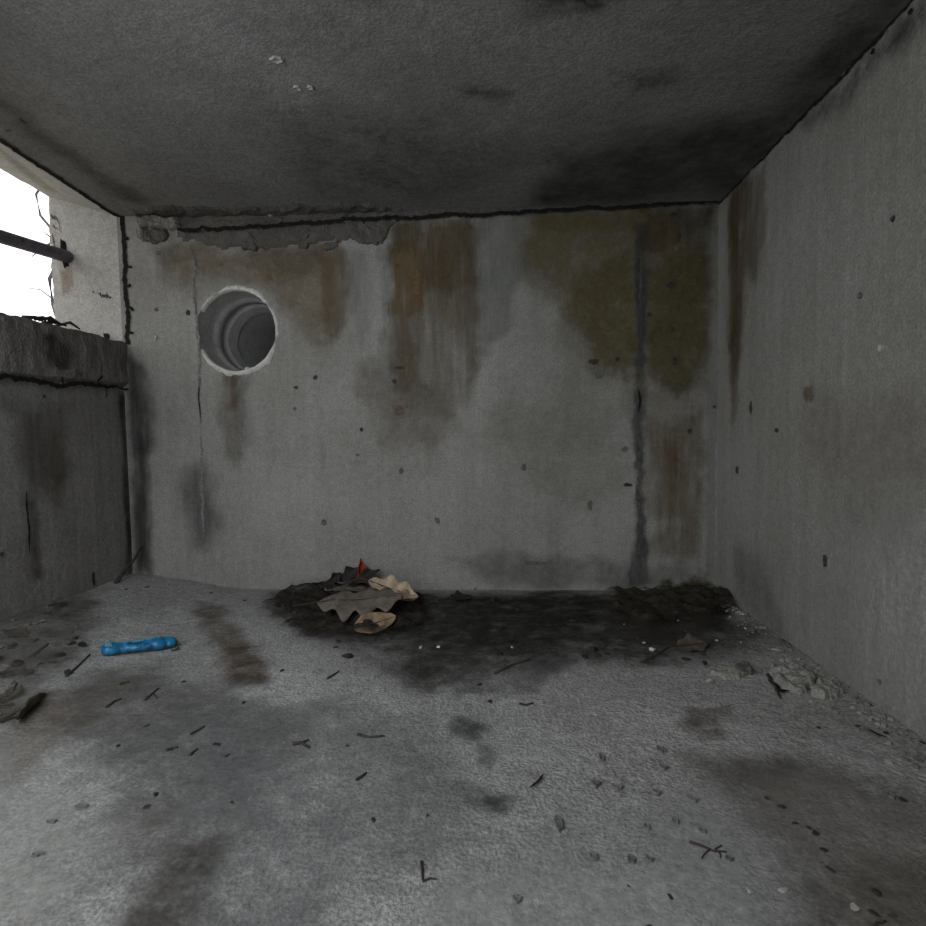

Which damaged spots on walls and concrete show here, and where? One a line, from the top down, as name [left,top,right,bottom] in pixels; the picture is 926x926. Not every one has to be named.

spalling [132,201,404,252]
corrosion [729,179,760,375]
crack [0,373,129,398]